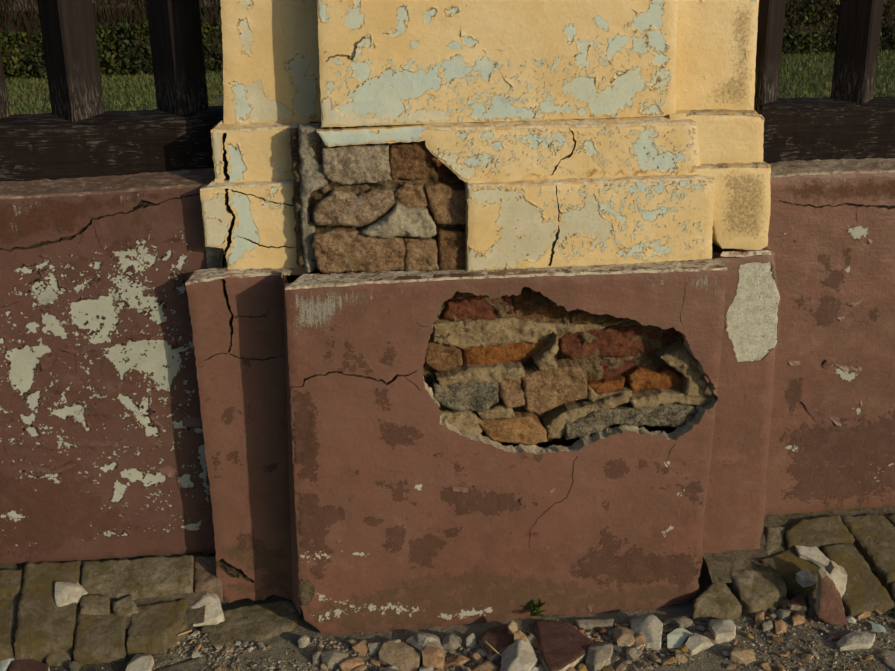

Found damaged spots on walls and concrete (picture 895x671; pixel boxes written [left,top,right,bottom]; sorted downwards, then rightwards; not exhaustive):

peeling [202,0,710,273]
crack [0,194,200,252]
crack [204,133,297,361]
crack [548,128,576,266]
spalling [724,261,780,364]
peeling [795,225,874,328]
crack [779,200,895,223]
peeling [0,226,244,541]
crack [291,370,422,391]
spalling [422,287,719,463]
damp [311,593,425,623]
damp [438,607,493,620]